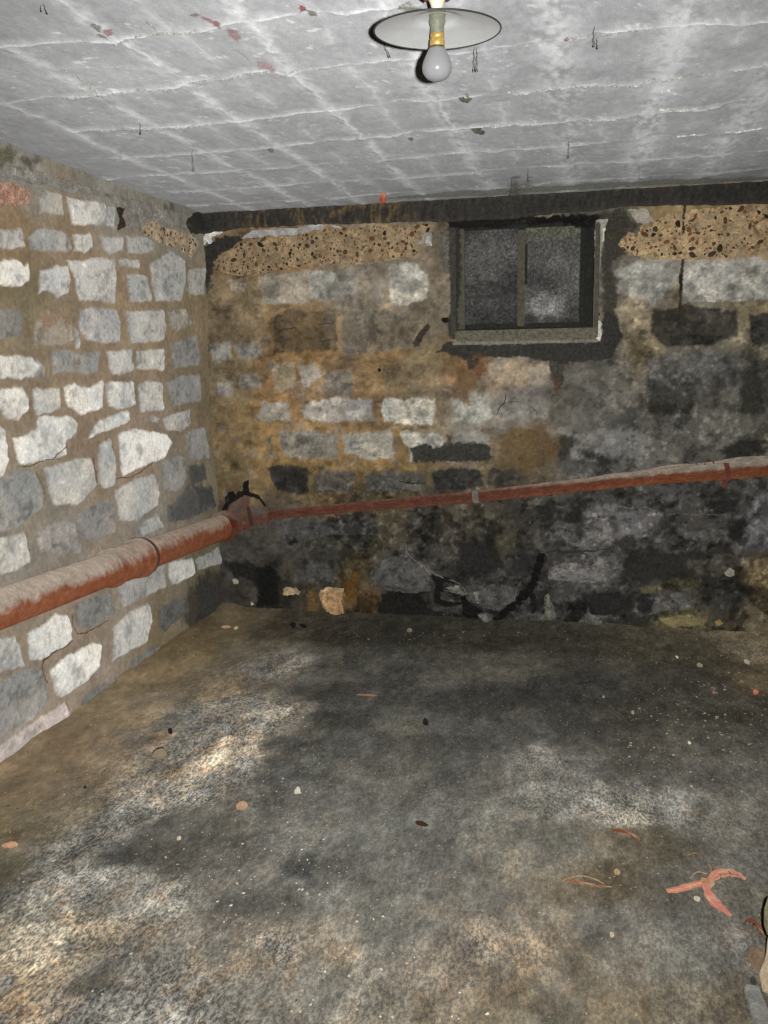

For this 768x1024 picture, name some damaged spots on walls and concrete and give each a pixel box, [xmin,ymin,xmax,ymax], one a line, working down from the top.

crack [54,48,318,100]
crack [508,73,767,137]
damp [622,386,694,424]
damp [410,436,491,463]
damp [558,436,619,466]
damp [720,441,765,458]
damp [713,500,748,543]
damp [600,535,686,581]
damp [186,560,281,627]
damp [377,591,442,616]
crack [404,541,609,621]
damp [585,592,654,614]